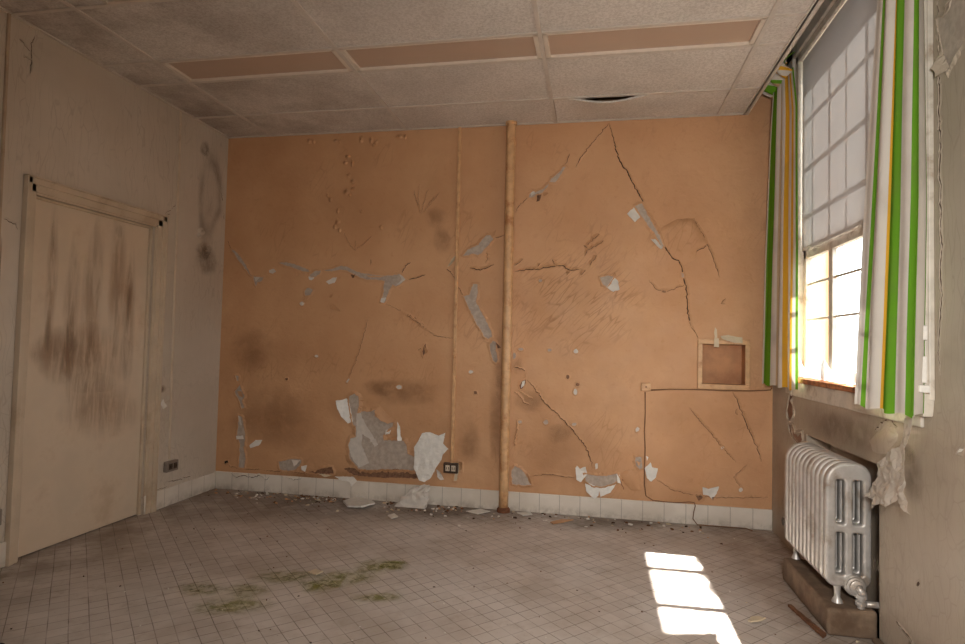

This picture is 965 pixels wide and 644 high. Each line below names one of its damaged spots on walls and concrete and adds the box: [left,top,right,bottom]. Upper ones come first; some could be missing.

peeling [268,259,425,305]
peeling [447,230,504,365]
crack [470,233,604,275]
peeling [627,201,665,249]
crack [575,122,726,338]
peeling [223,373,464,508]
crack [527,379,593,468]
peeling [509,463,622,499]
crack [656,391,768,499]